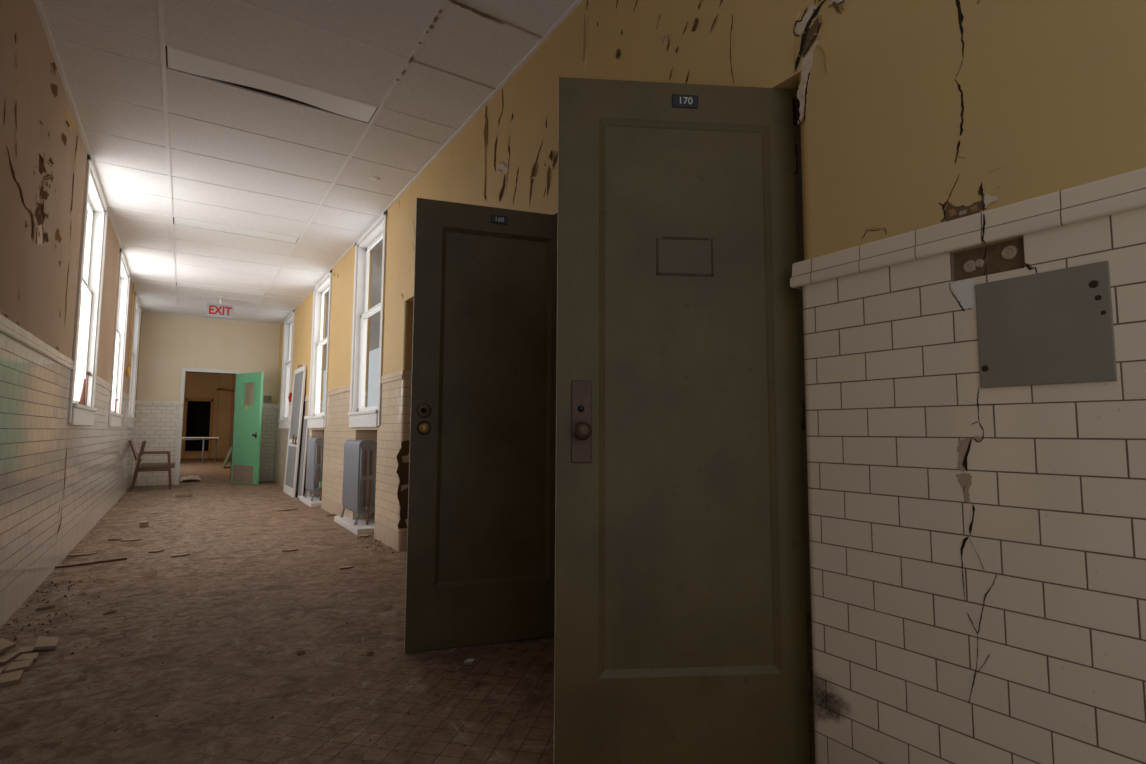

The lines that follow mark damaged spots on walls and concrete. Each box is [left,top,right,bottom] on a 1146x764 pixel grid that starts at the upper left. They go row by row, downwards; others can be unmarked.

peeling [793,0,845,125]
crack [954,0,966,163]
peeling [6,109,78,325]
peeling [483,88,508,202]
peeling [529,141,558,206]
crack [980,214,988,244]
spalling [396,440,410,529]
crack [955,389,997,702]